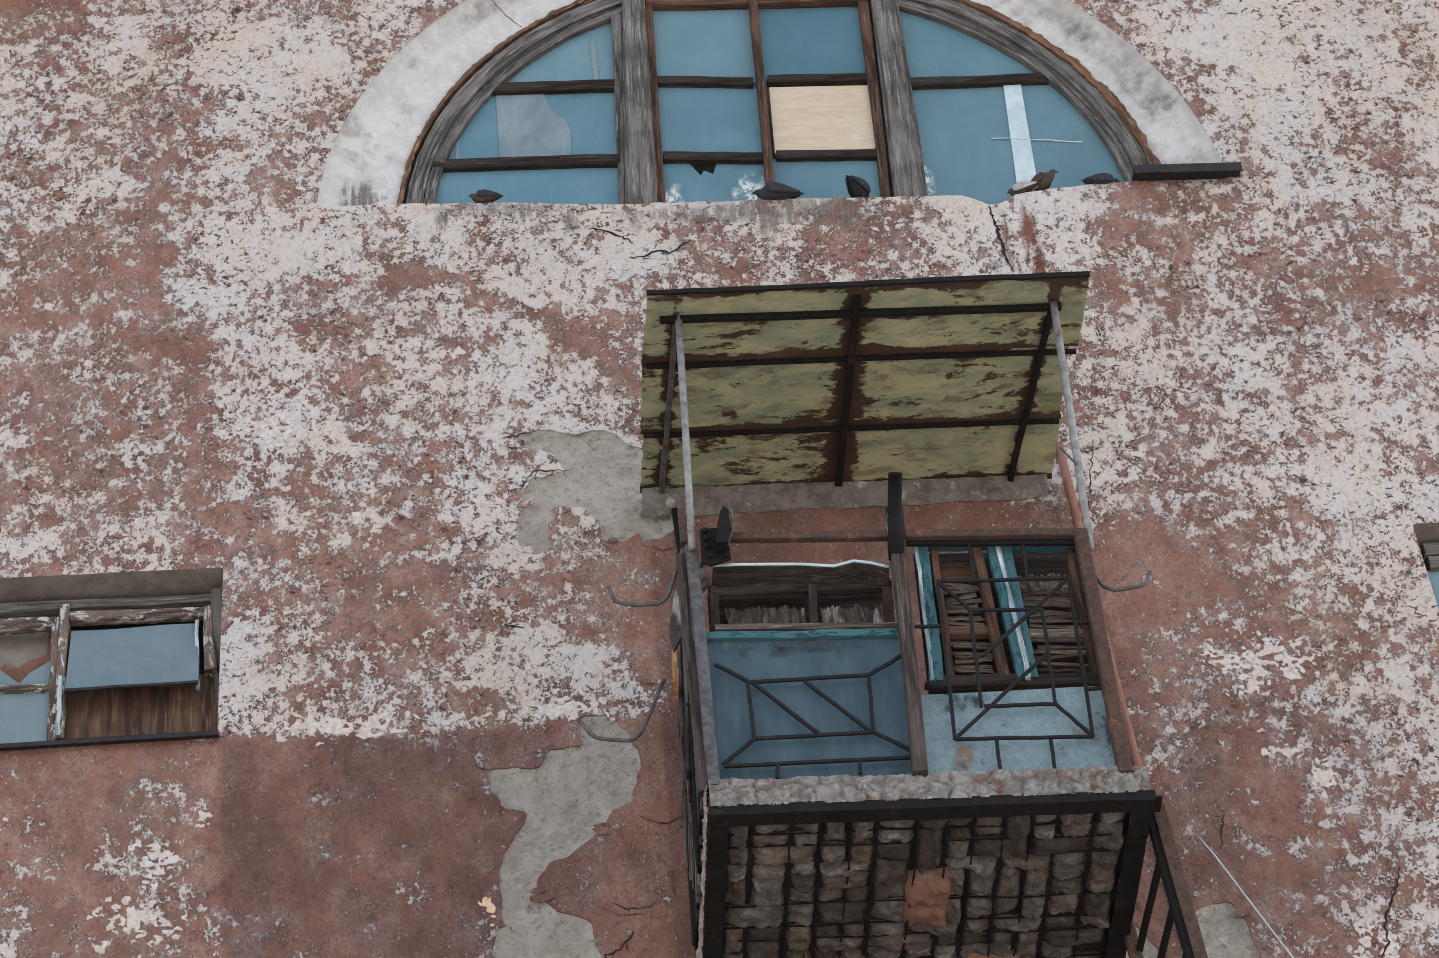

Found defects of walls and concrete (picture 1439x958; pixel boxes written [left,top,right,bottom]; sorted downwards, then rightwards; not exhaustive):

crack [989,206,1013,271]
peeling [243,405,310,459]
peeling [346,501,371,525]
spalling [503,428,674,555]
peeling [269,704,422,746]
peeling [195,810,212,828]
spalling [476,682,641,958]
spalling [696,765,1151,958]
peeling [86,839,188,958]
peeling [0,936,17,958]
spalling [1126,925,1183,958]
spalling [1195,902,1274,958]